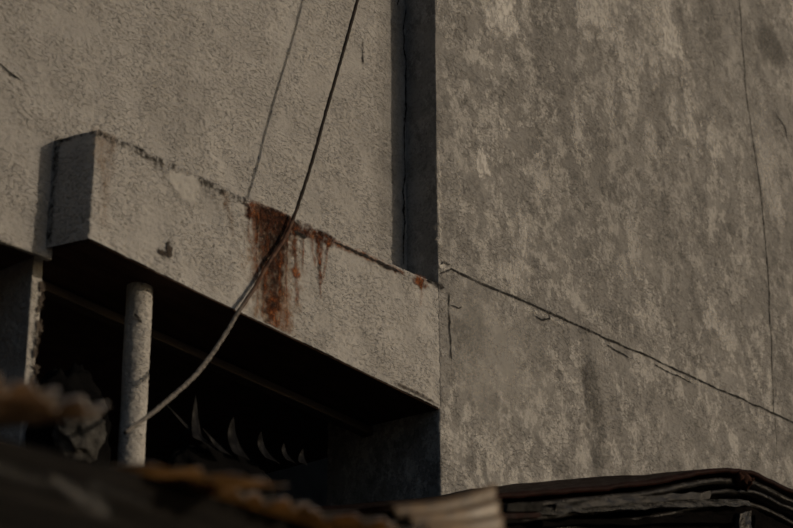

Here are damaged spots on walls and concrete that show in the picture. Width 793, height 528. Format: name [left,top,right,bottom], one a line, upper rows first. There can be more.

rust [246,202,377,331]
crack [335,0,407,272]
crack [427,0,793,448]